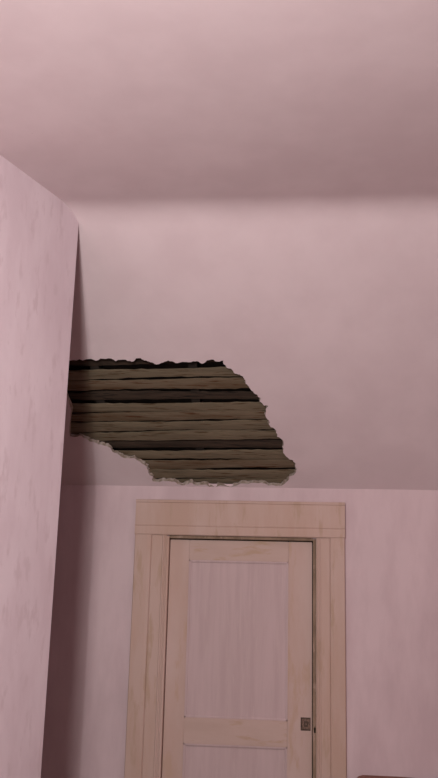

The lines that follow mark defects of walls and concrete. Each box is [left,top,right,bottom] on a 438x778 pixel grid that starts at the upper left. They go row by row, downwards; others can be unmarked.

spalling [67,358,297,487]